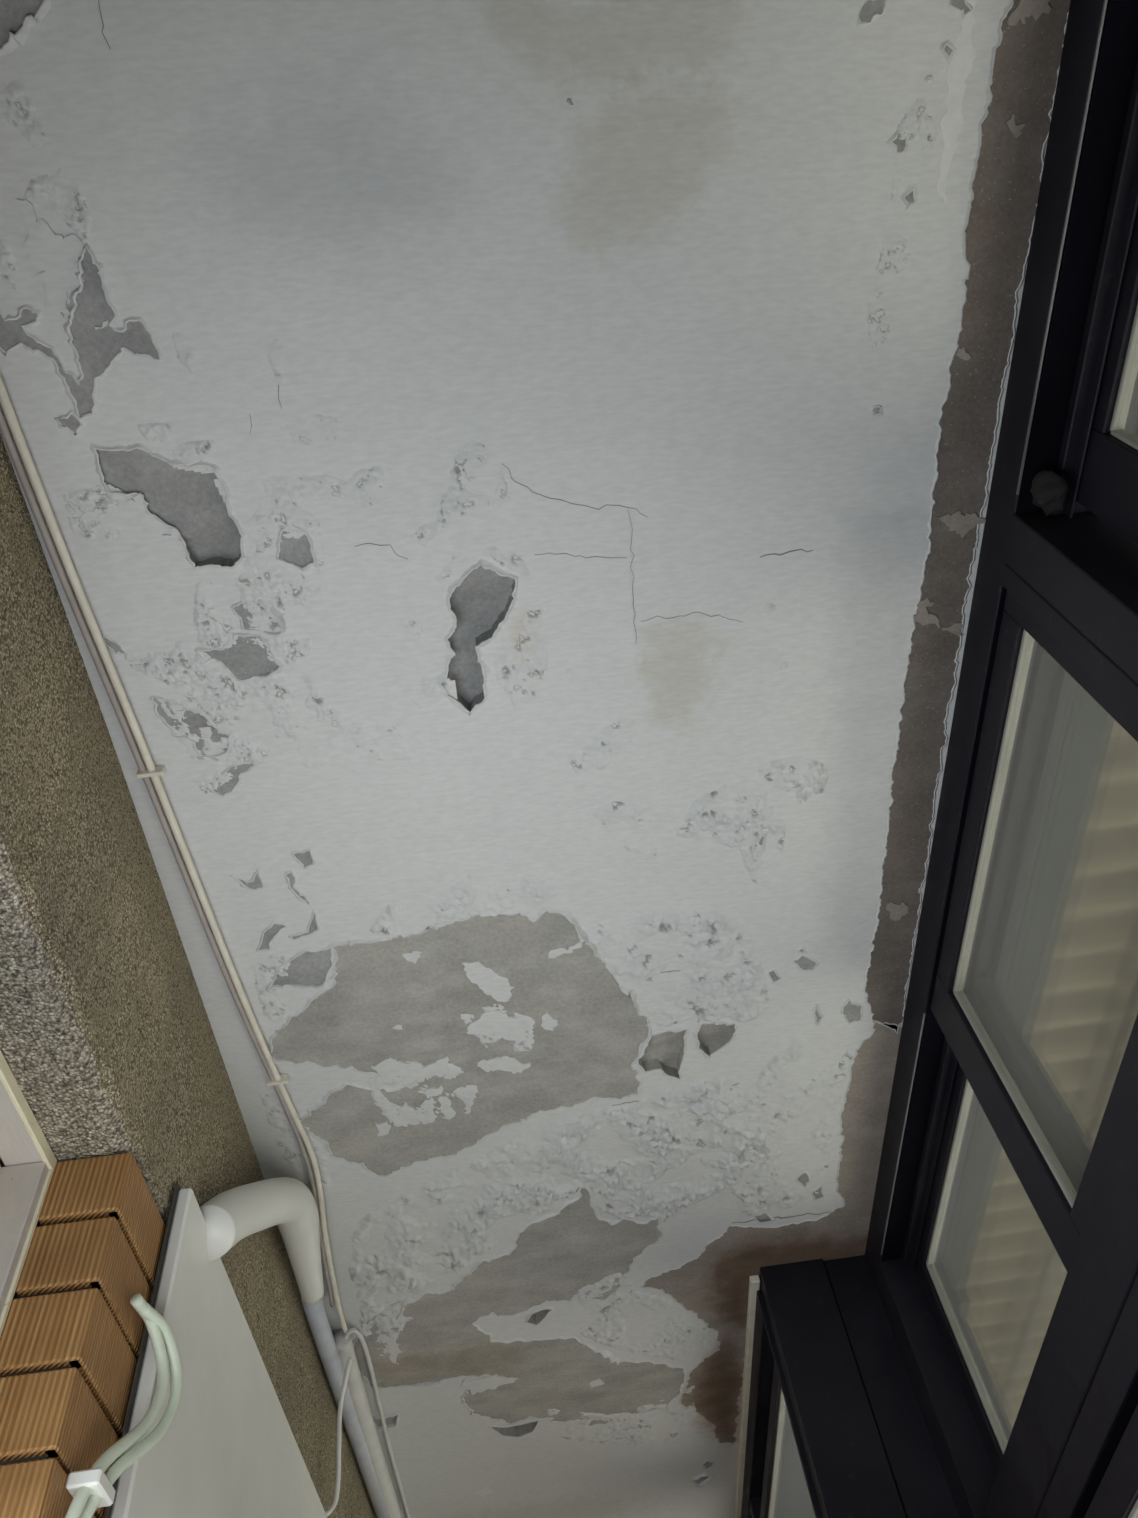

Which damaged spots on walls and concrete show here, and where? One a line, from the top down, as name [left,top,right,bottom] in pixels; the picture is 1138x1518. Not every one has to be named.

peeling [0,0,52,57]
spalling [0,199,335,797]
crack [503,464,741,640]
peeling [229,868,265,891]
peeling [250,848,819,1178]
peeling [352,0,1071,1445]